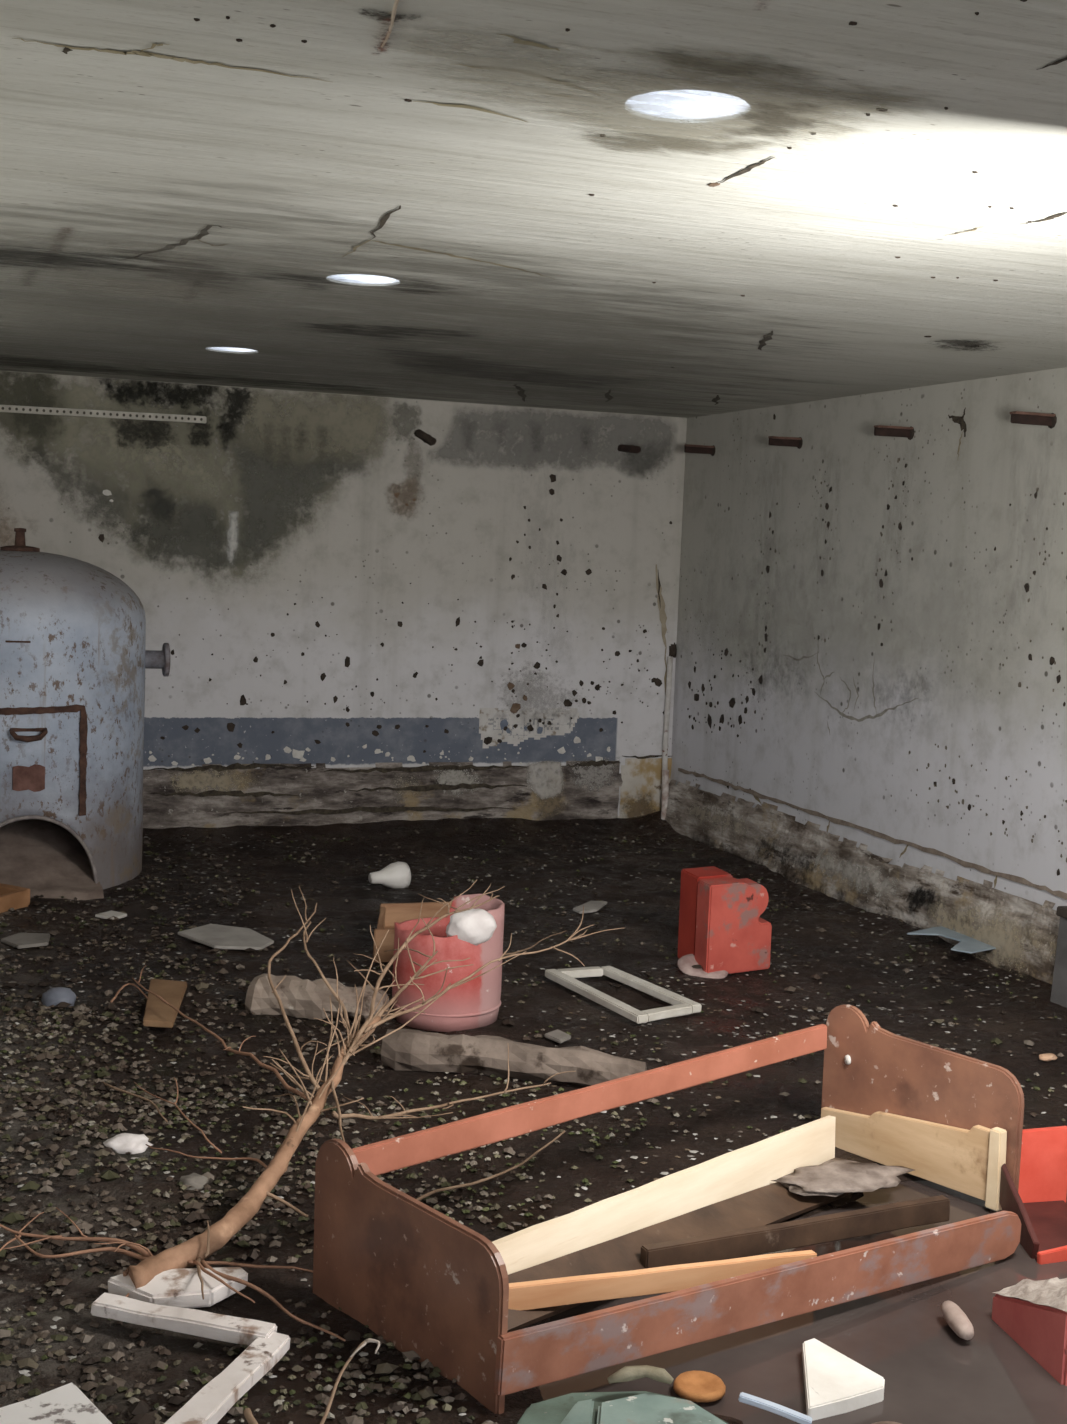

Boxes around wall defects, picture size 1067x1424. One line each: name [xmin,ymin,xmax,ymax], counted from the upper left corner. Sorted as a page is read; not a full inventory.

water stain [403,30,914,155]
crack [1036,57,1067,70]
water stain [0,245,242,290]
peeling [817,481,833,611]
peeling [1028,640,1066,706]
flaking render [143,584,1060,984]